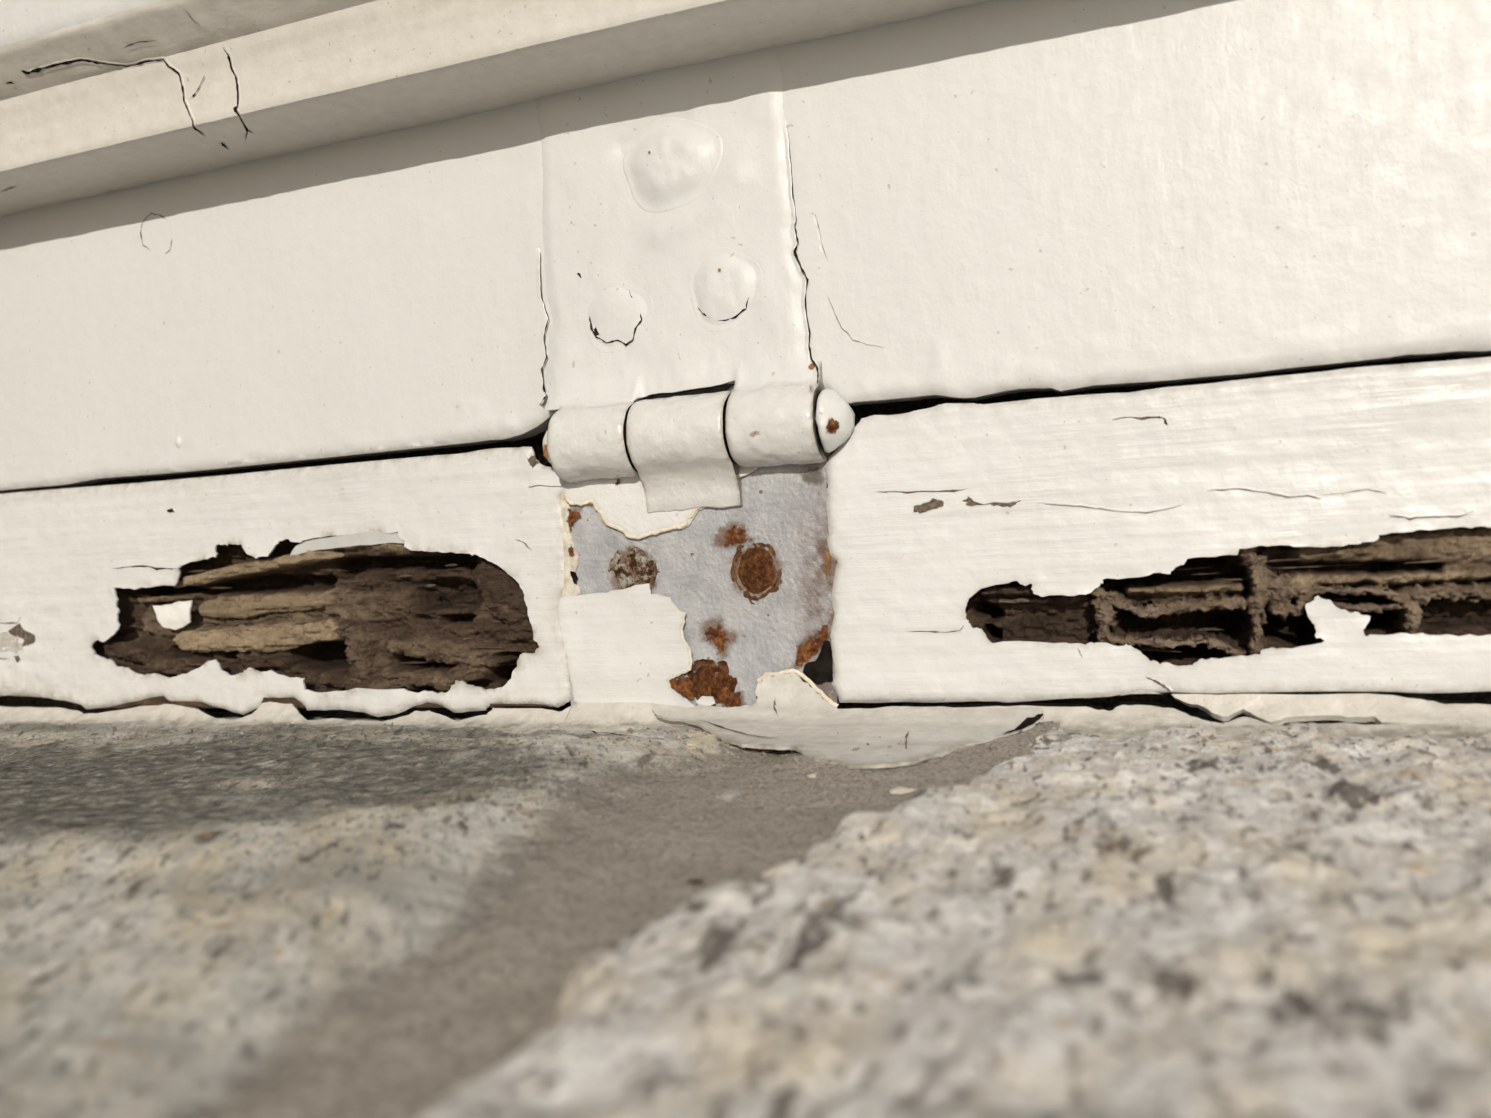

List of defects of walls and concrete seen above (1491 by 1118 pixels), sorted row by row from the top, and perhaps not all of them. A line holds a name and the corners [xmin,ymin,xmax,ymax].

crack [6,13,256,150]
crack [783,121,889,383]
corrosion [567,502,592,556]
corrosion [612,547,656,589]
corrosion [716,523,748,547]
corrosion [818,544,831,576]
peeling [153,600,193,630]
peeling [527,456,1044,778]
corrosion [669,620,745,707]
corrosion [794,624,830,667]